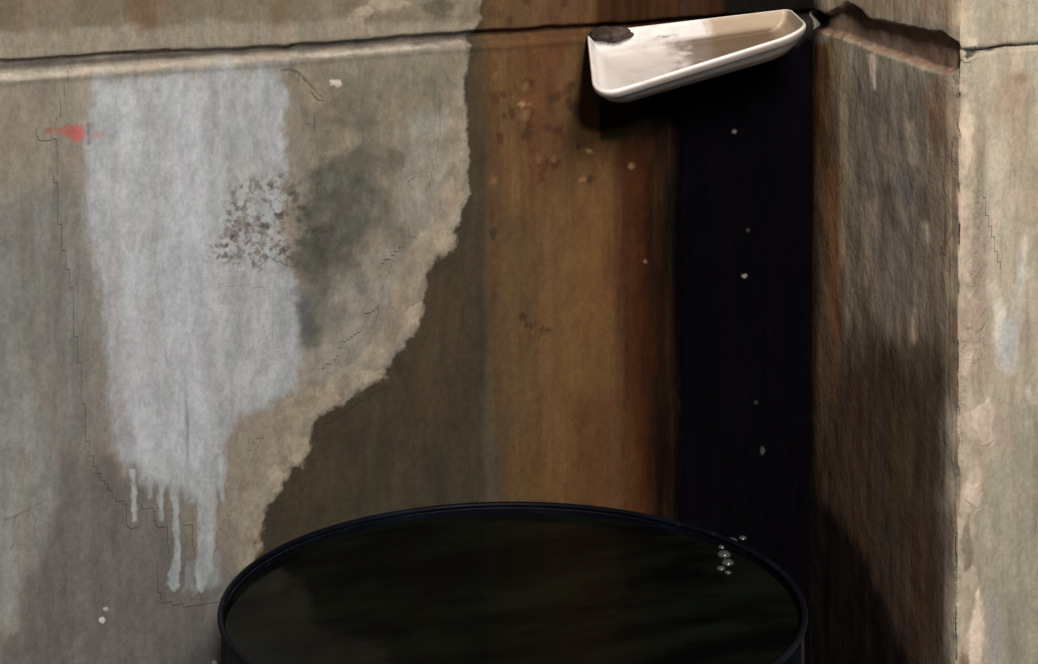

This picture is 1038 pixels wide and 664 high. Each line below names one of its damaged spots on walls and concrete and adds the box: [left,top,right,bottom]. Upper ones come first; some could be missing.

peeling [186,152,340,289]
damp [95,70,476,607]
crack [278,66,325,100]
spalling [830,0,995,664]
damp [829,35,1038,664]
crack [960,40,1038,62]